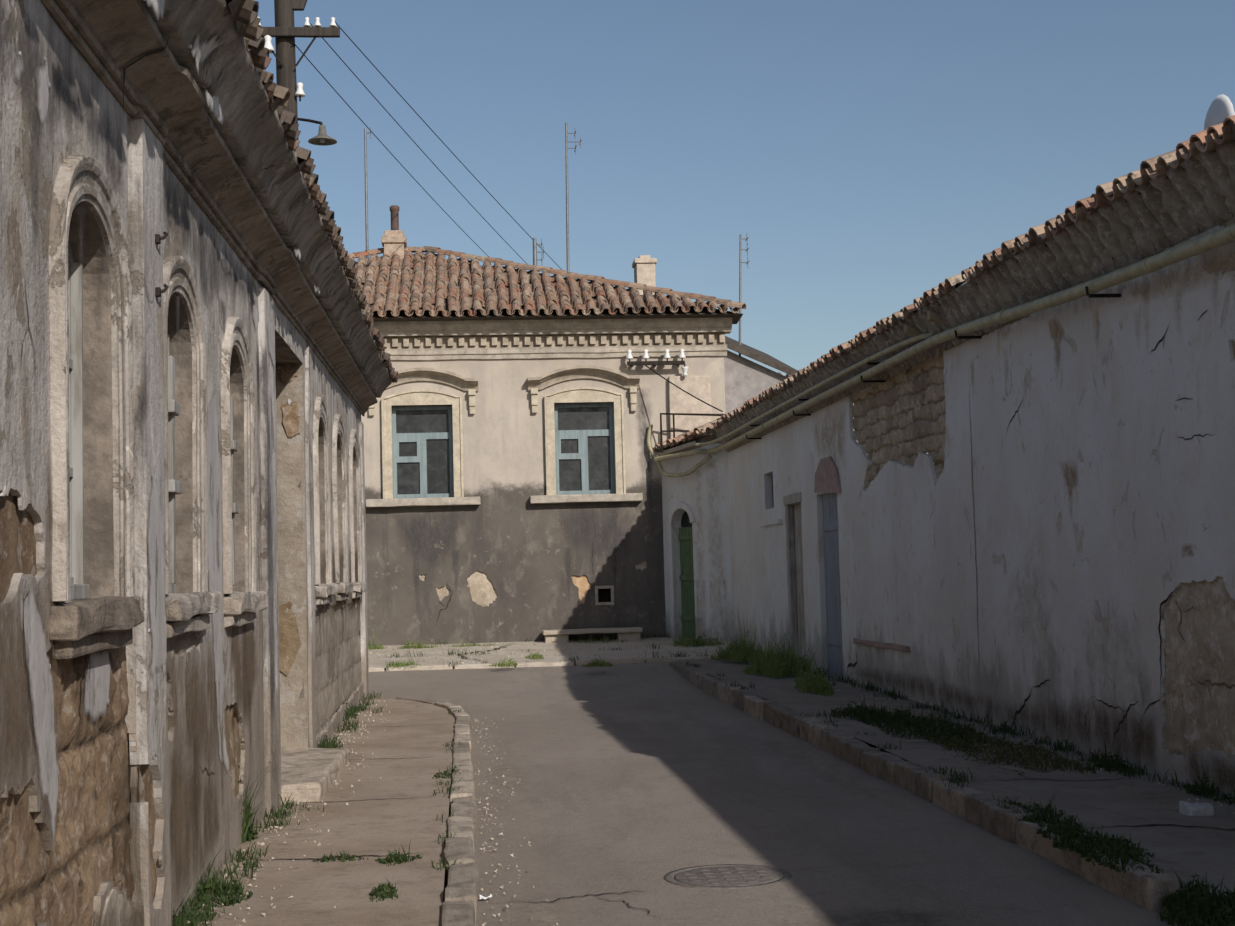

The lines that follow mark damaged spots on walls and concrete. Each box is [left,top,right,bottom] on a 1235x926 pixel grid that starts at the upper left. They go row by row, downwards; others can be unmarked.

leakage [0,7,120,175]
leakage [164,194,252,301]
spalling [852,353,946,490]
spalling [419,574,450,601]
spalling [467,571,498,607]
spalling [571,575,591,604]
spalling [0,478,163,926]
spalling [1163,572,1235,758]